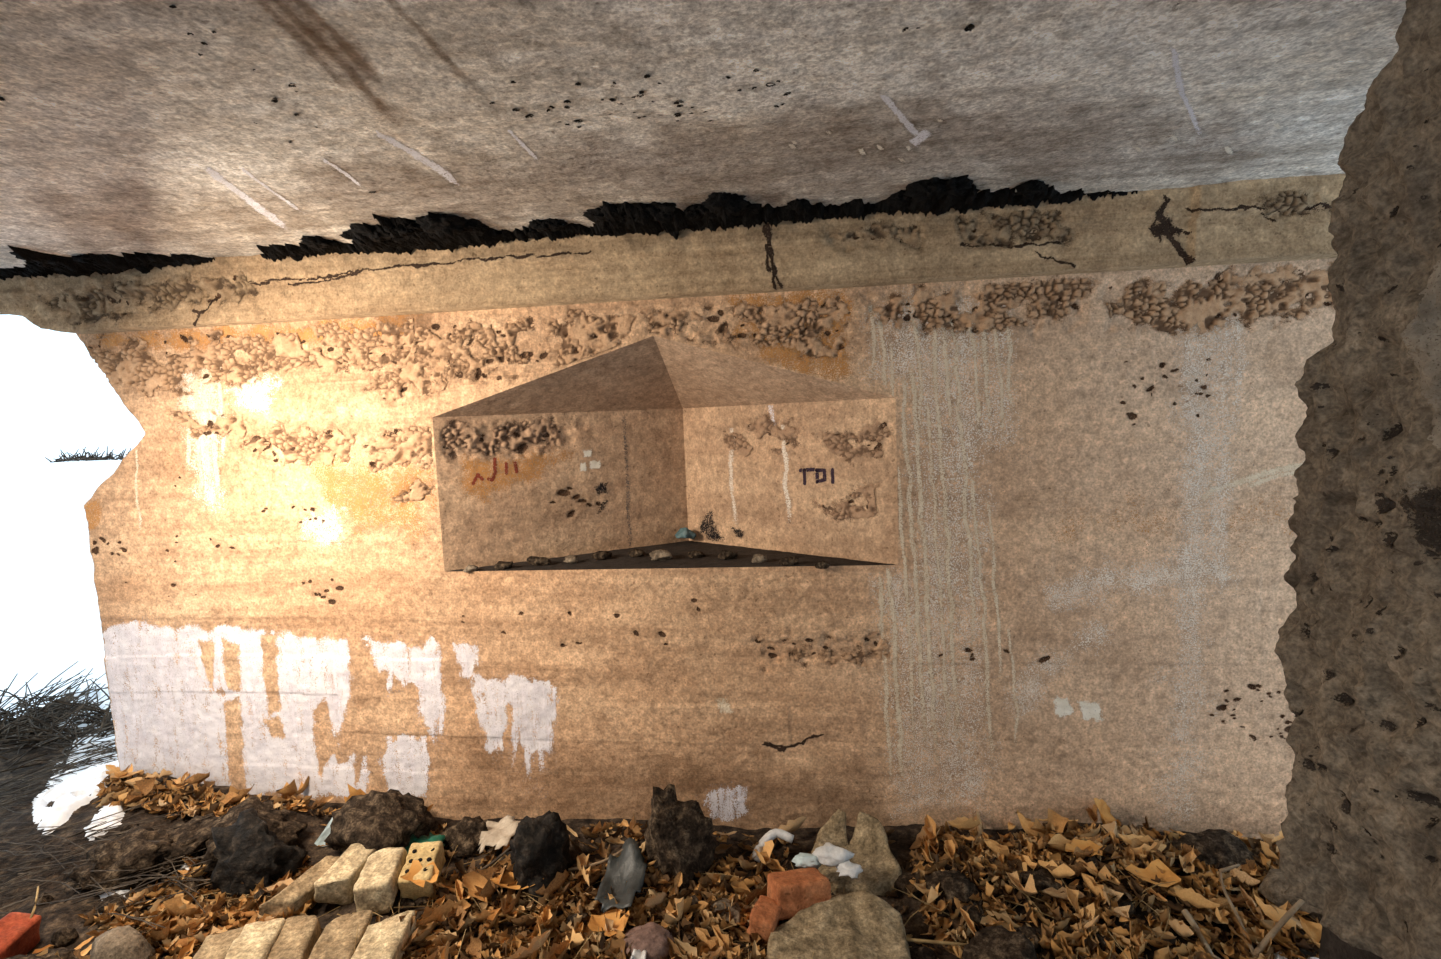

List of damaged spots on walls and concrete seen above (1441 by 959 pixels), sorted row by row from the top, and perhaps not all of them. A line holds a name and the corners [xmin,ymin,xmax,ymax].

crack [762,223,783,290]
crack [1149,194,1332,265]
water stain [854,286,1251,828]